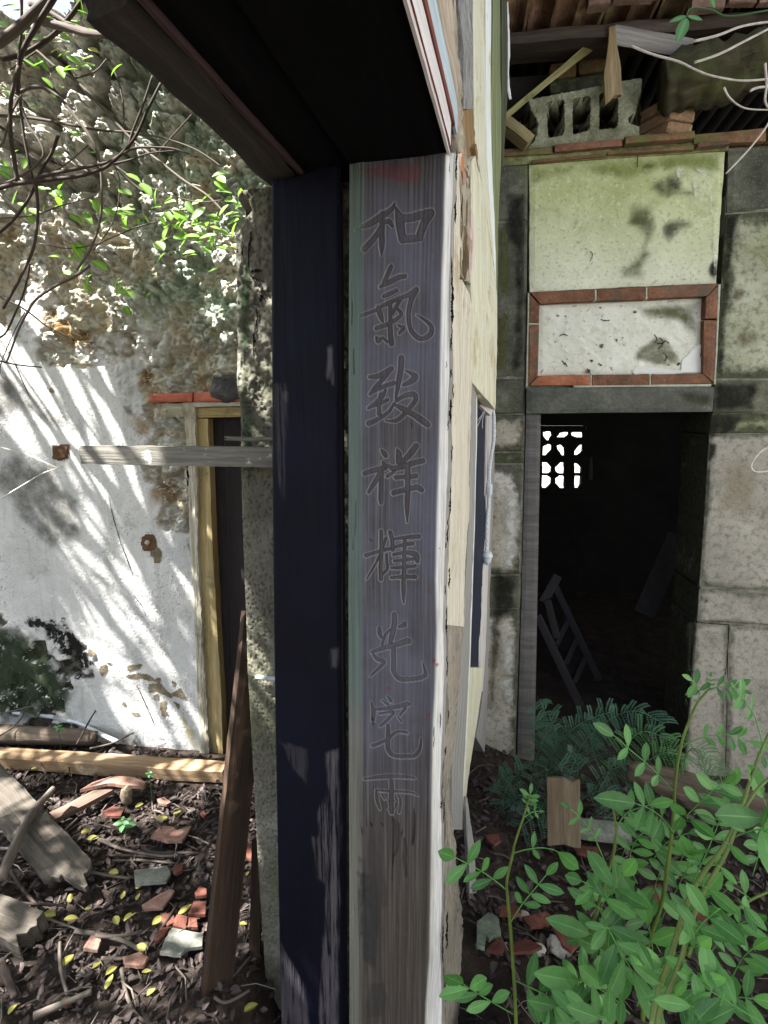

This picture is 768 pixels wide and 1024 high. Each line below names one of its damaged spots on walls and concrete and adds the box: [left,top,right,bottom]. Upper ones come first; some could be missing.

water stain [657,169,680,194]
water stain [632,210,652,228]
water stain [665,223,682,236]
water stain [638,339,676,363]
rust [141,534,157,551]
water stain [492,494,517,704]
flaking render [88,649,112,676]
flaking render [126,664,186,716]